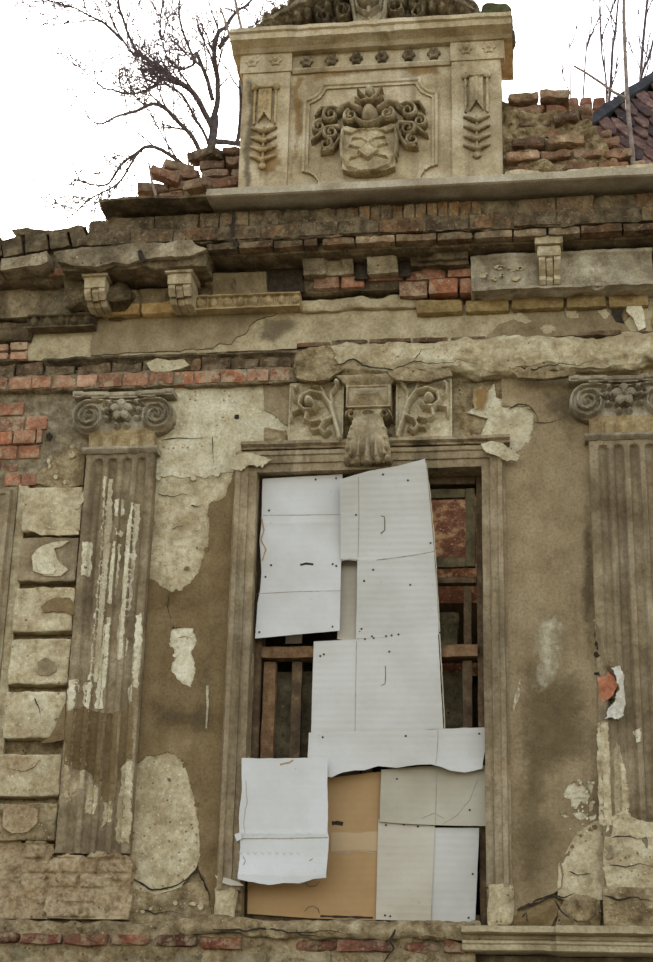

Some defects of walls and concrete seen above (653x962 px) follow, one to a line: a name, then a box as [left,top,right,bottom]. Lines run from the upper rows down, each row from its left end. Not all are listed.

crack [334,348,481,370]
crack [515,359,599,371]
spalling [0,393,89,510]
spalling [150,306,653,594]
peeling [29,476,214,923]
spalling [557,619,653,901]
crack [517,893,653,922]